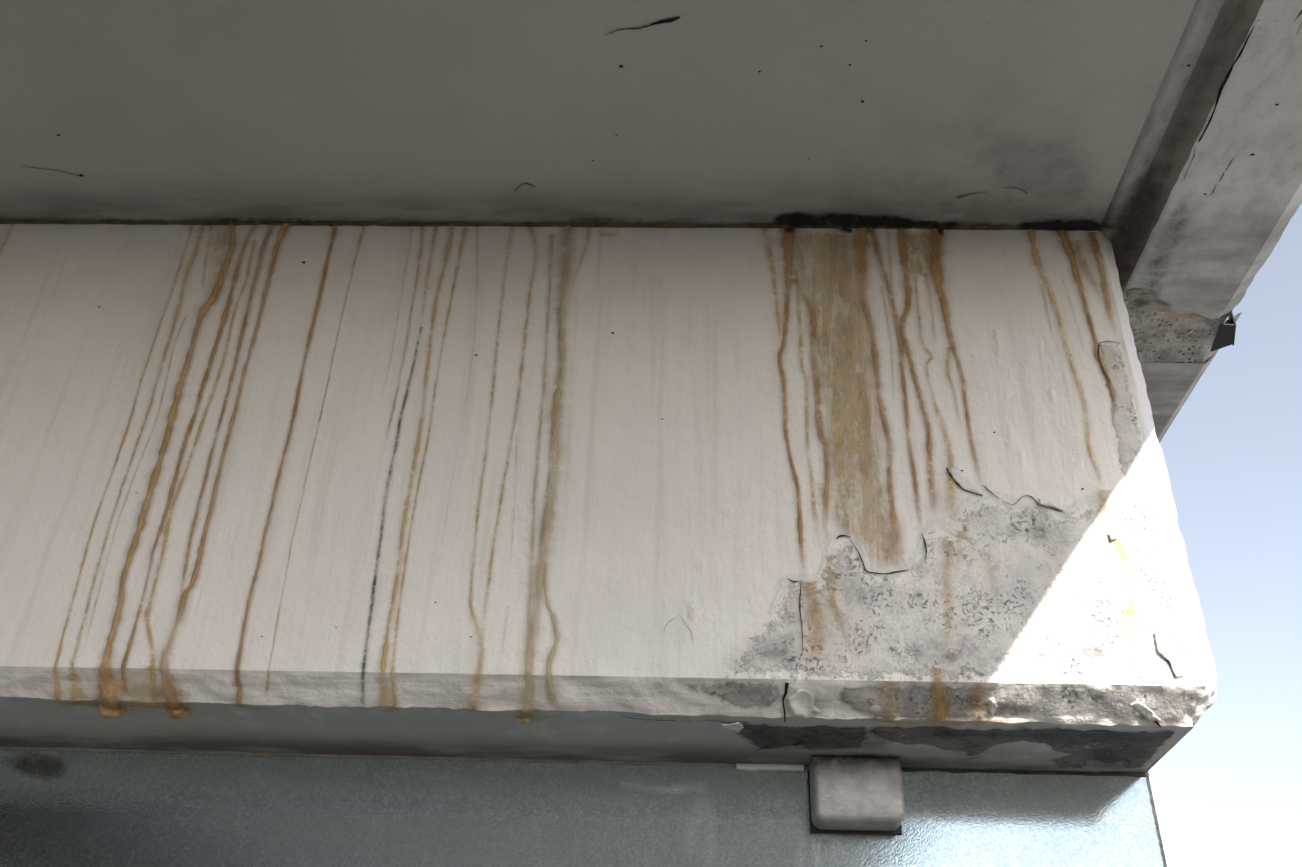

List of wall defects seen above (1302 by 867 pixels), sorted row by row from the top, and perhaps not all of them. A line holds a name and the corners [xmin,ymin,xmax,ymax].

corrosion [53,223,289,710]
leakage [362,575,376,690]
corrosion [380,418,430,711]
corrosion [424,225,466,397]
leakage [521,459,559,719]
leakage [0,180,1157,475]
corrosion [768,228,977,558]
crack [836,534,927,574]
peeling [689,344,1198,768]
crack [946,468,1065,513]
corrosion [1028,229,1084,401]
corrosion [1057,230,1115,410]